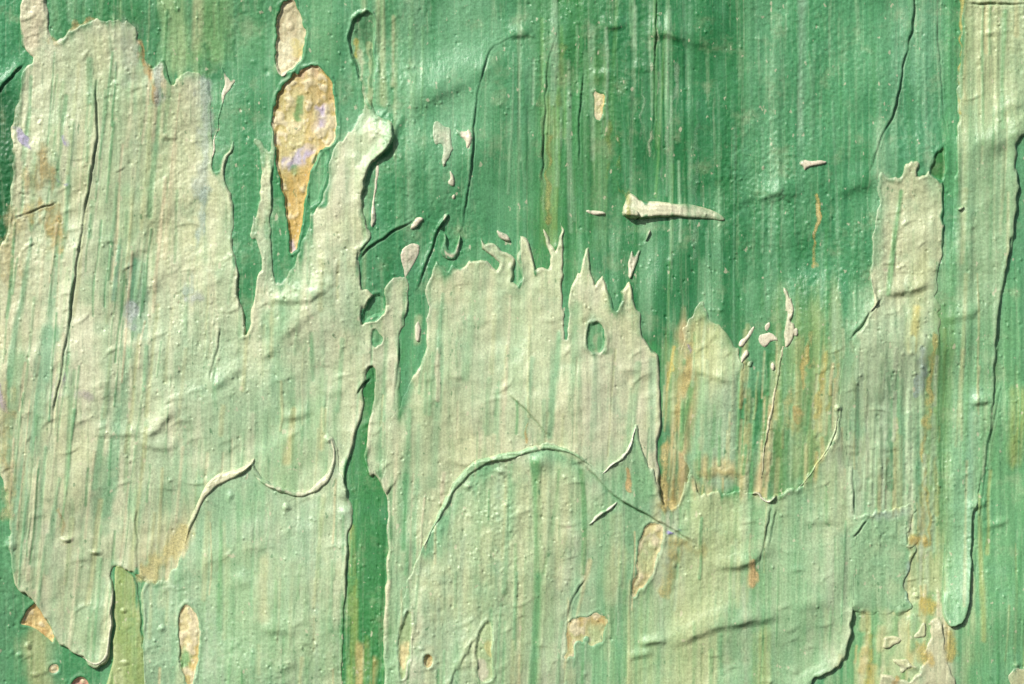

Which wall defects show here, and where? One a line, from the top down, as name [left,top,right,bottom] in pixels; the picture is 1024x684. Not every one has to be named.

crack [14,74,101,437]
peeling [0,0,420,684]
peeling [382,160,945,684]
crack [870,0,1024,163]
peeling [879,149,1020,684]
crack [970,377,1006,595]
peeling [957,0,1024,134]
peeling [1008,669,1024,684]